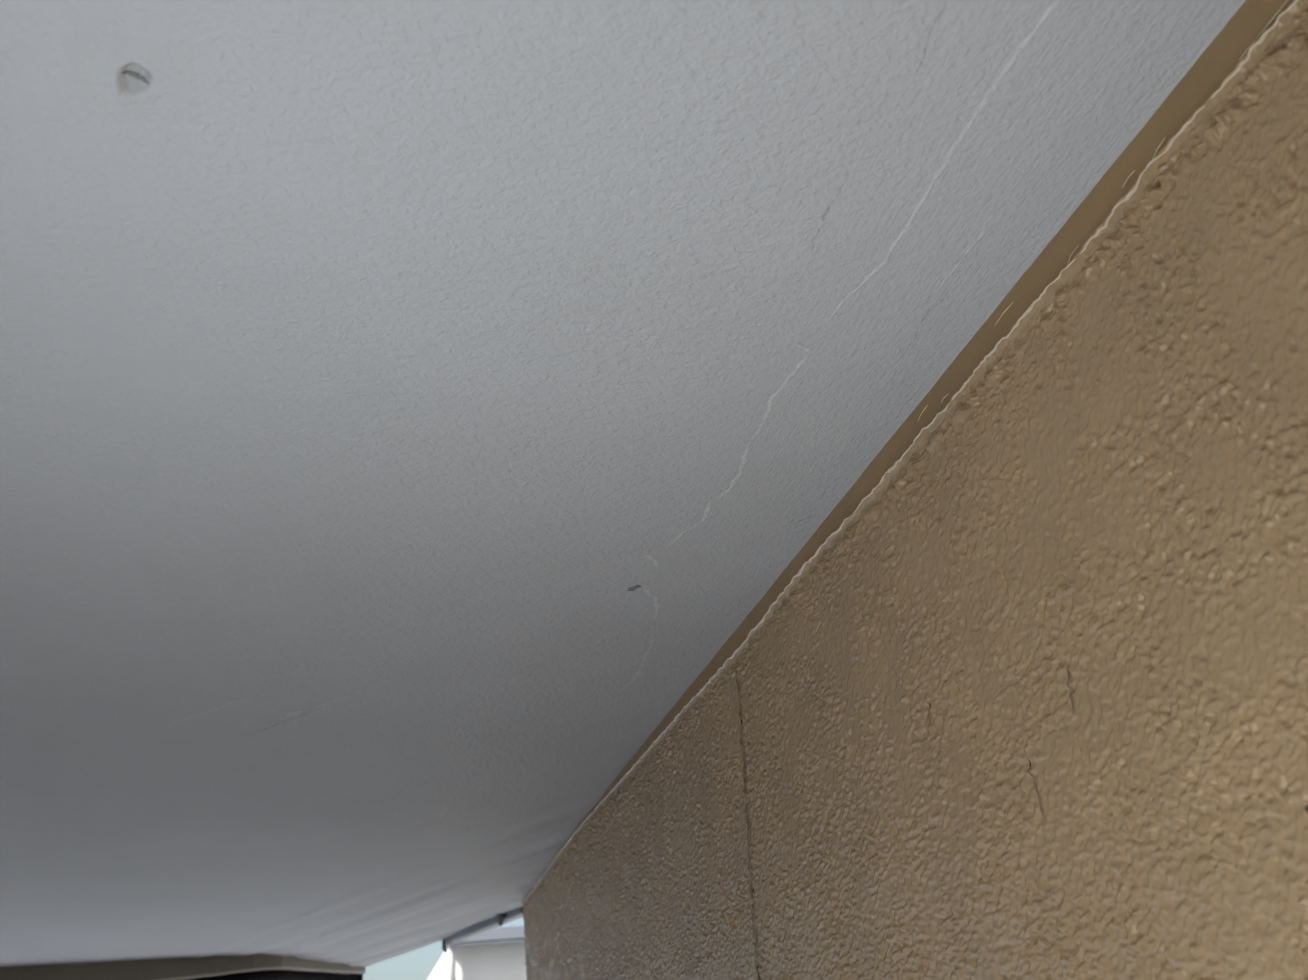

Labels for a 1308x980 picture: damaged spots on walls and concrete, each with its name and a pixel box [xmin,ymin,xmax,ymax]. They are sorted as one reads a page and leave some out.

crack [620,0,1063,693]
crack [734,663,760,980]